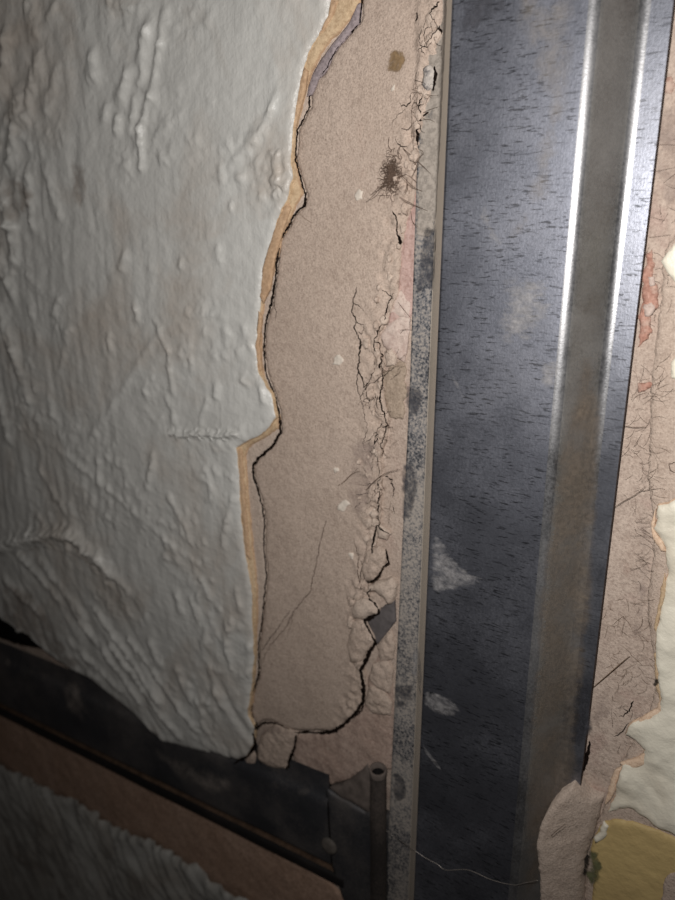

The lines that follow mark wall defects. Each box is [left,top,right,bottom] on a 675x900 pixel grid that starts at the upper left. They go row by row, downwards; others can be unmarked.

peeling [294,0,363,130]
crack [391,1,442,147]
peeling [255,141,304,377]
crack [392,211,402,244]
flaking render [380,194,416,362]
crack [233,0,395,769]
peeling [238,415,281,653]
flaking render [293,631,396,784]
peeling [594,498,675,843]